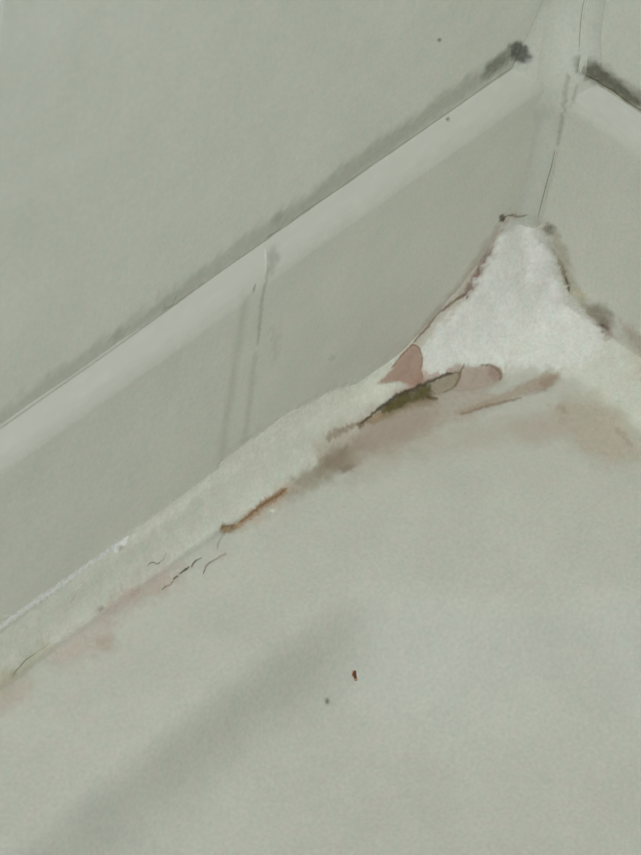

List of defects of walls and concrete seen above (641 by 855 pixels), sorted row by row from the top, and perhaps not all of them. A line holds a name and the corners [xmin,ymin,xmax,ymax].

leakage [511,43,530,61]
peeling [381,344,423,385]
corrosion [221,489,285,533]